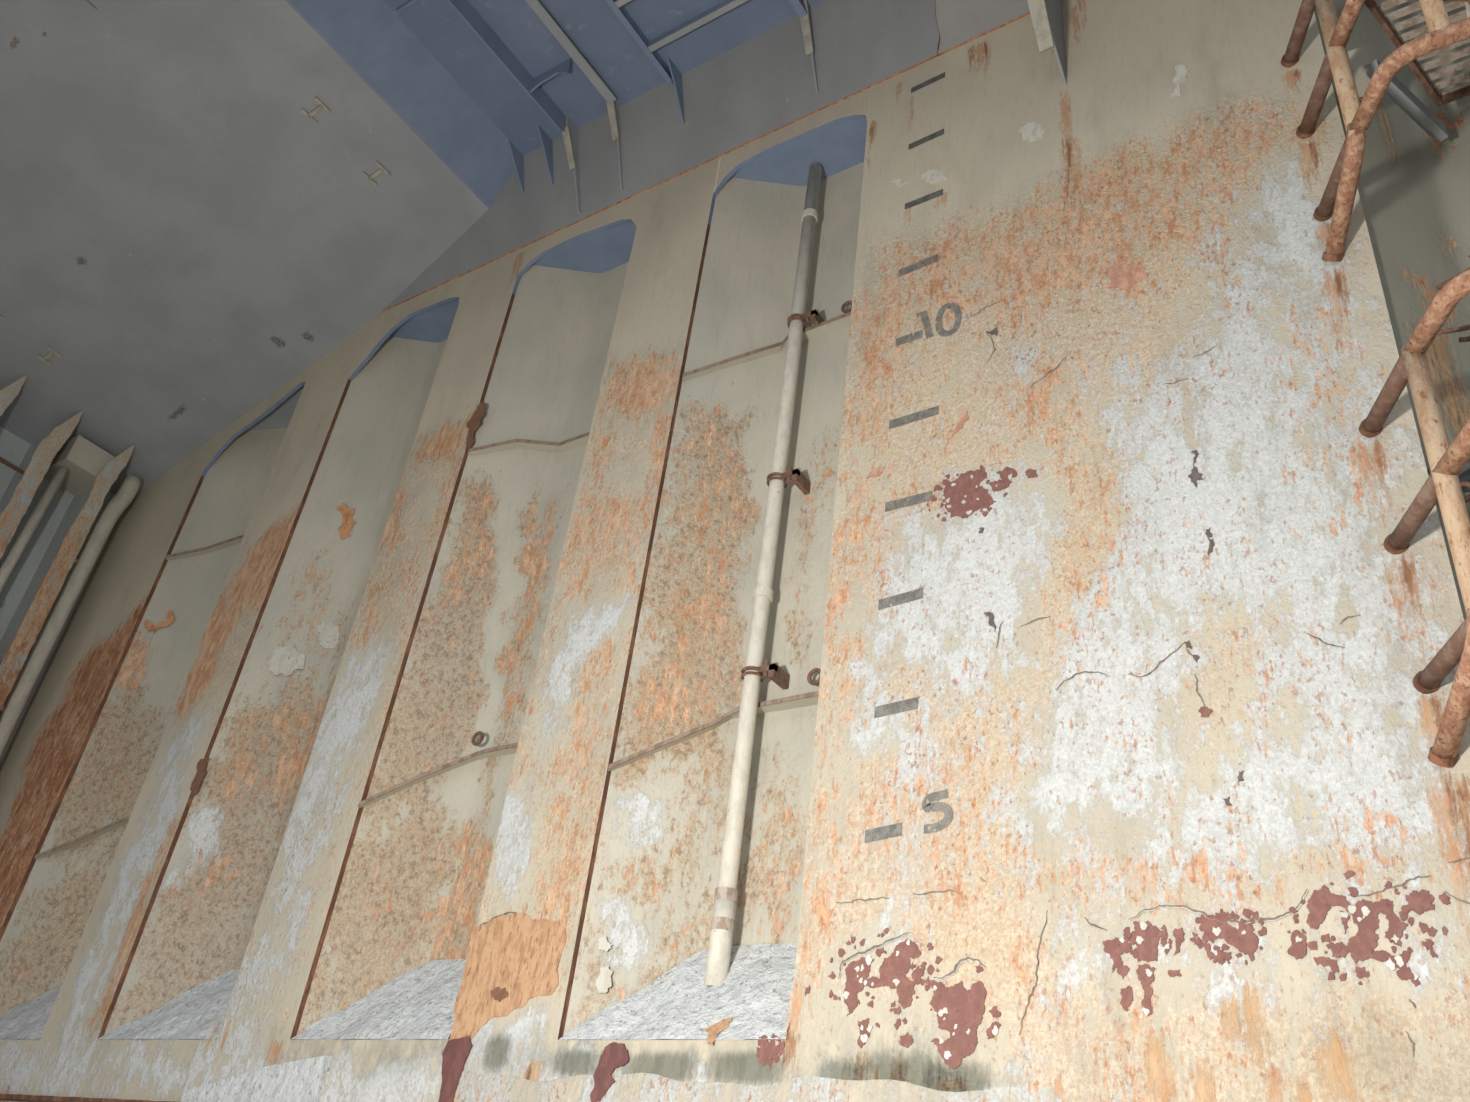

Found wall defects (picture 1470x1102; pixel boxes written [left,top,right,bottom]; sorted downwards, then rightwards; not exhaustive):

corrosion [1061,94,1080,194]
corrosion [1325,271,1348,325]
corrosion [949,411,969,437]
corrosion [337,503,356,539]
peeling [926,465,1038,534]
crack [996,616,1051,647]
crack [1056,643,1205,706]
corrosion [190,757,209,796]
peeling [1103,909,1267,1017]
peeling [1287,870,1450,987]
peeling [438,912,567,1102]
peeling [828,927,1002,1069]